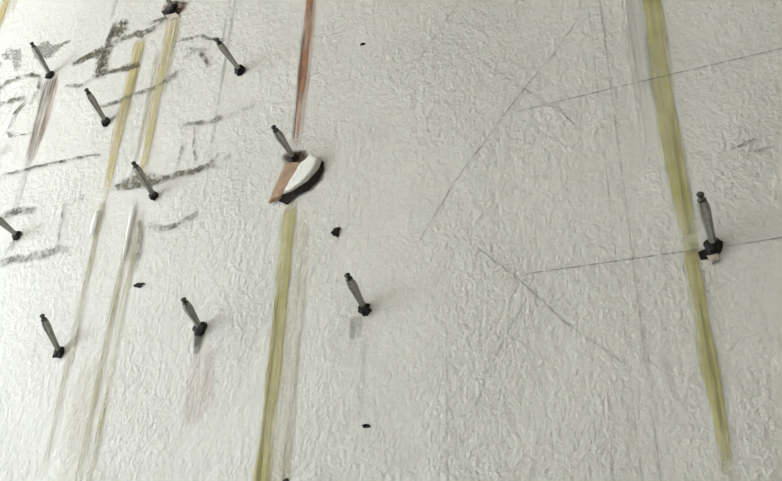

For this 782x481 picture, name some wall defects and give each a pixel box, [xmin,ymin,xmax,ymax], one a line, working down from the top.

corrosion [283,151,305,163]
spalling [269,153,324,205]
corrosion [294,0,313,134]
leakage [643,0,693,230]
leakage [253,209,295,481]
leakage [685,252,730,459]